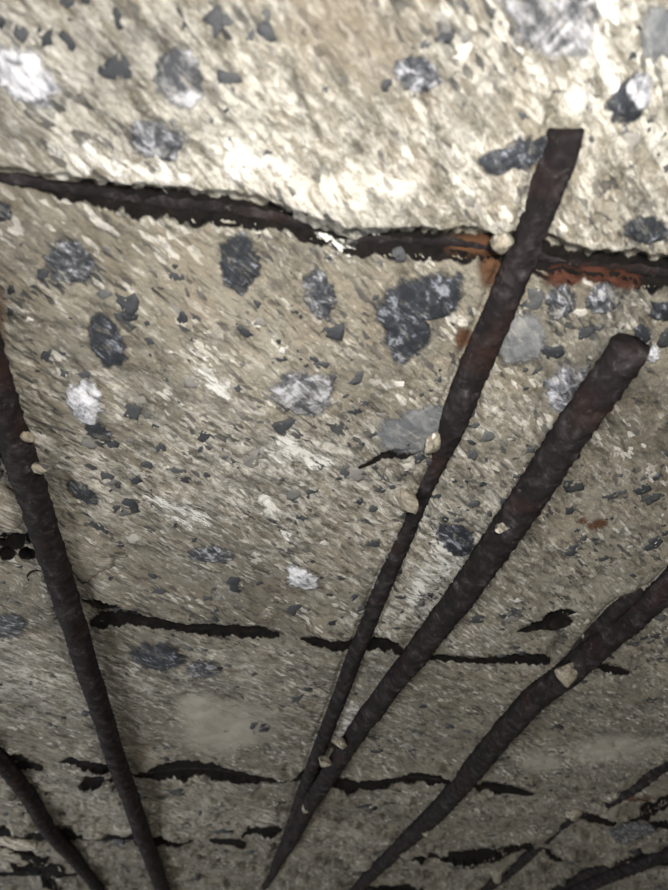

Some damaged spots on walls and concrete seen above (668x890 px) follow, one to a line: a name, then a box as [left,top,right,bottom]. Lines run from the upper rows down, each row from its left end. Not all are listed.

spalling [0,172,350,240]
crack [5,175,512,265]
corrosion [452,236,501,286]
corrosion [545,266,639,288]
crack [533,240,668,295]
corrosion [454,329,470,348]
spalling [262,128,668,890]
spalling [0,333,247,890]
crack [82,599,279,639]
crack [300,637,403,655]
crack [429,653,550,666]
crack [5,751,450,797]